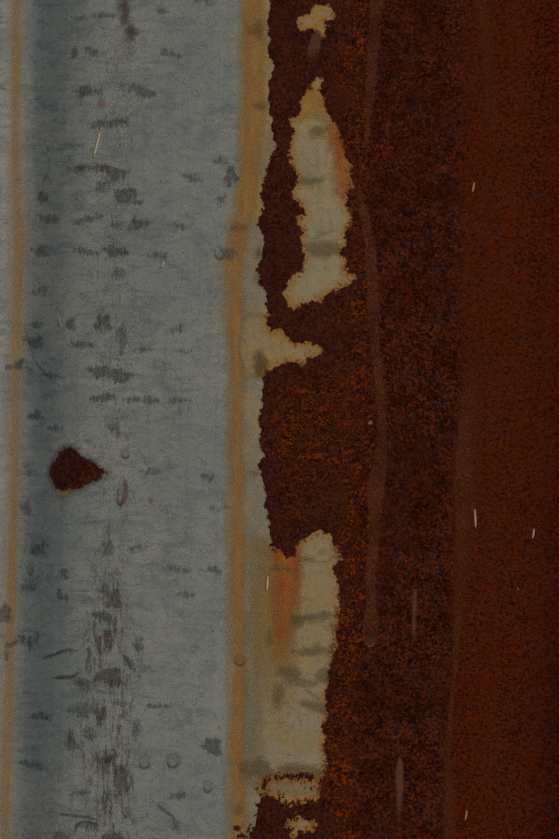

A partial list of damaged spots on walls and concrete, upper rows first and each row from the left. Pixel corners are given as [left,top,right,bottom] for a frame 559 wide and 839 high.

corrosion [49,447,107,497]
corrosion [222,0,559,839]